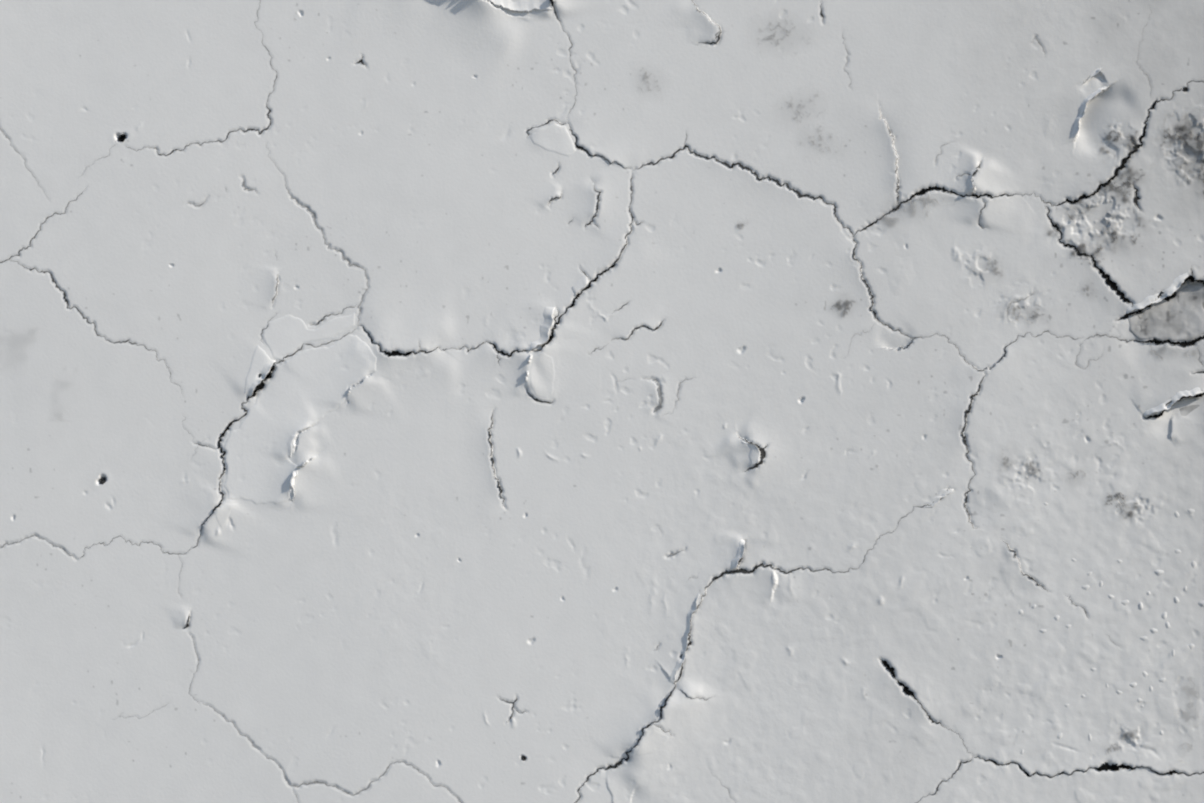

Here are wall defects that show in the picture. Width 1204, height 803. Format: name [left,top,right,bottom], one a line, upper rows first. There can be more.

peeling [490,0,552,12]
peeling [1070,68,1109,141]
crack [0,0,1204,597]
spalling [1126,273,1204,342]
spalling [215,312,377,529]
peeling [1143,387,1203,416]
crack [183,614,461,803]
crack [575,488,949,803]
crack [879,657,1204,803]
crack [1003,541,1121,648]